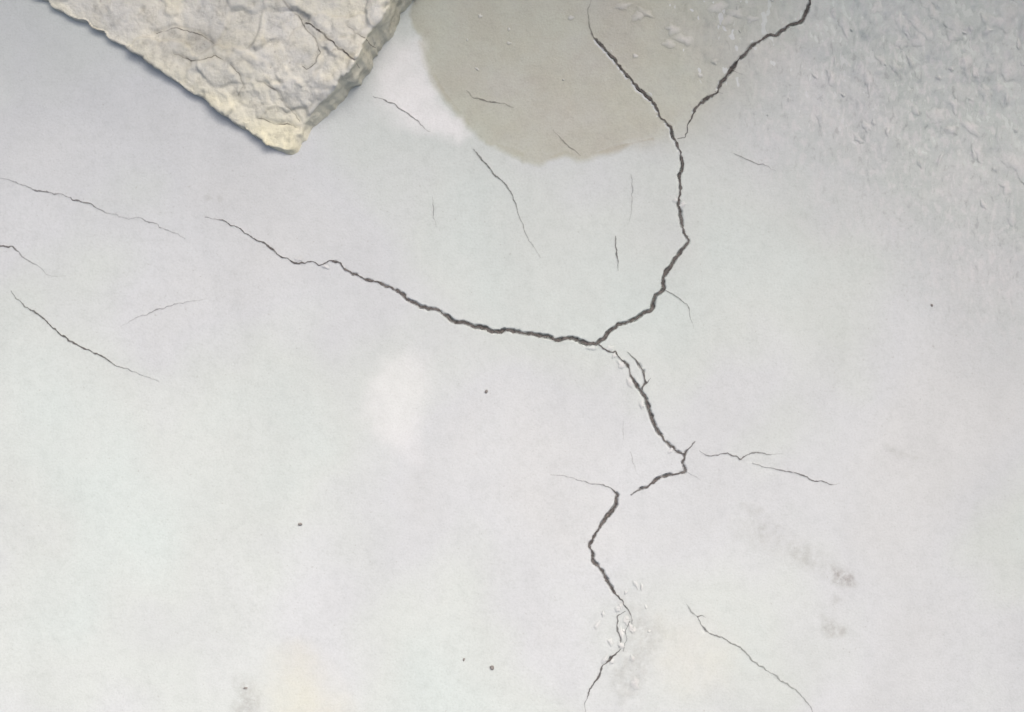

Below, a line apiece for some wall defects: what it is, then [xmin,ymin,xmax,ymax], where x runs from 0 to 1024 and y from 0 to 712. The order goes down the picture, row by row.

water stain [361,0,709,170]
crack [20,301,119,367]
crack [217,0,831,699]